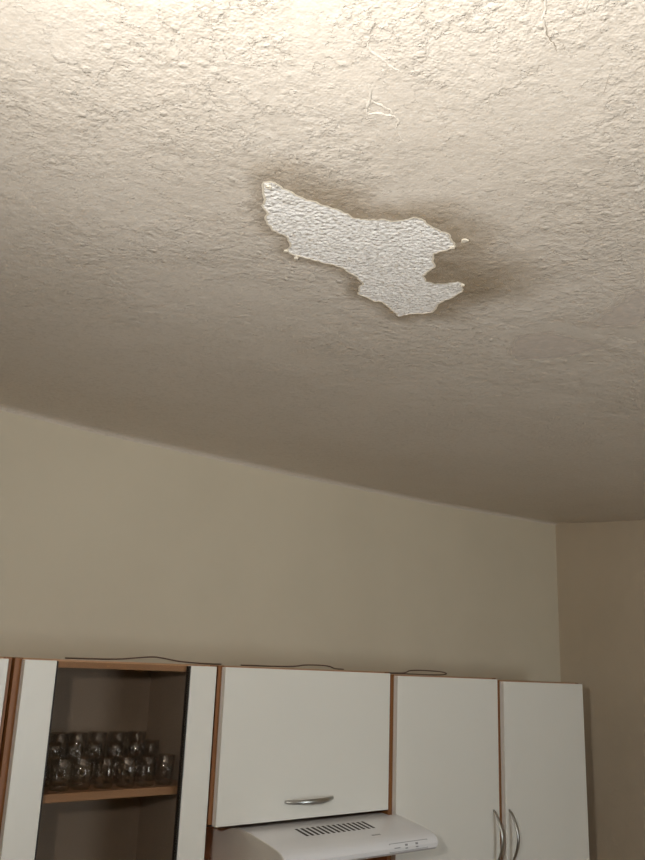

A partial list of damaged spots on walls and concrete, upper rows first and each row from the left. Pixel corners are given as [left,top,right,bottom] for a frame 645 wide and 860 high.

water stain [303,196,368,219]
peeling [261,181,469,317]
water stain [384,212,463,283]
water stain [353,269,502,318]